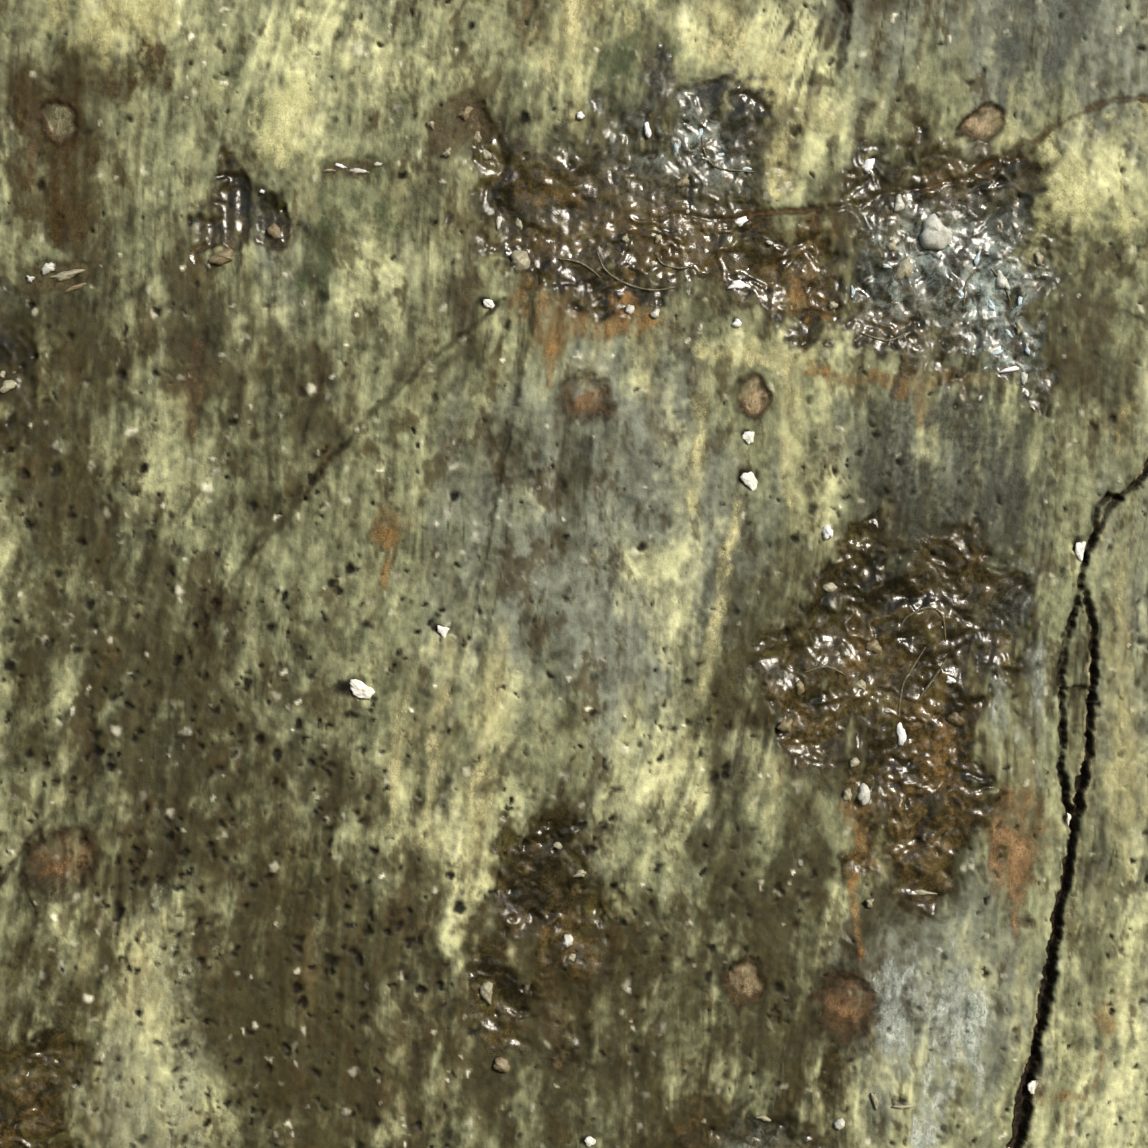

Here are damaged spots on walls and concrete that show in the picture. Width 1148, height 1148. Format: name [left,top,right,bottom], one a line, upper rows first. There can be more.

crack [969,96,1148,176]
spalling [188,137,311,266]
spalling [426,43,1065,411]
crack [738,207,817,218]
crack [340,403,380,449]
crack [286,469,321,518]
spalling [752,508,1035,918]
crack [1005,454,1148,1148]
crack [0,824,43,884]